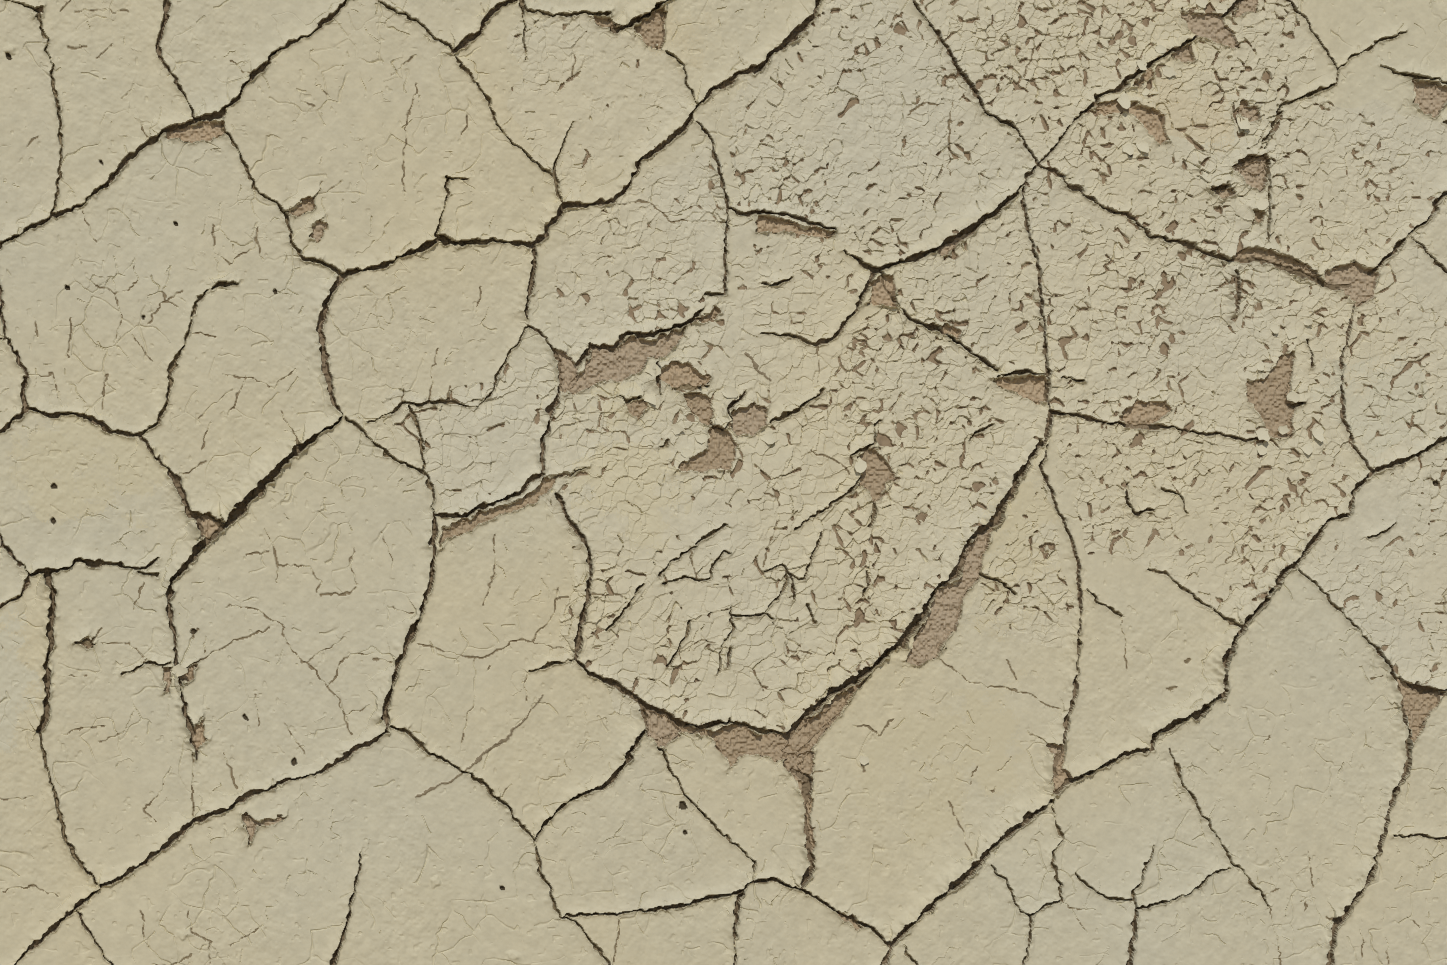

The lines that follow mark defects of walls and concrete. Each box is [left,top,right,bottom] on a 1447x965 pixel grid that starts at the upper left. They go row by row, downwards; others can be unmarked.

peeling [15,848,167,965]
crack [0,305,1447,965]
peeling [382,0,1447,852]
crack [1367,191,1447,275]